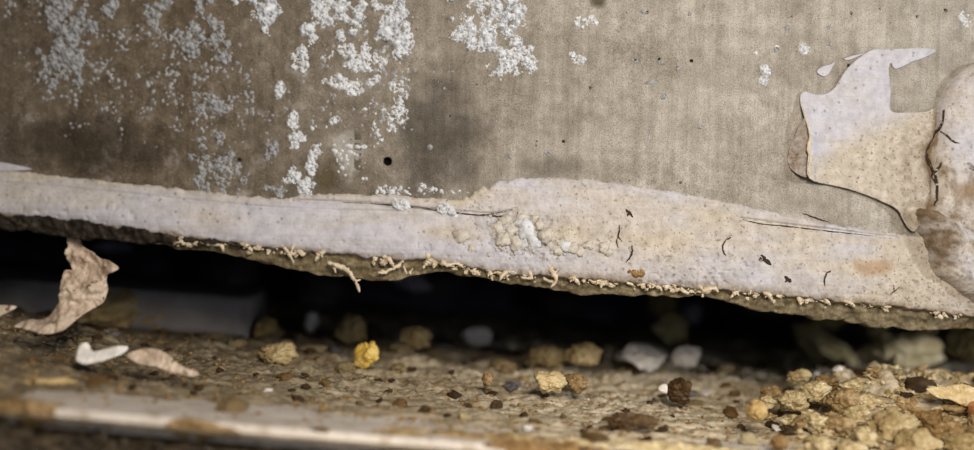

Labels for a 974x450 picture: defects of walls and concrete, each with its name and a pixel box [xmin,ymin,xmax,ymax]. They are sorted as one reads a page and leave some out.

efflorescence [5,0,427,199]
efflorescence [449,0,539,81]
peeling [817,54,863,77]
efflorescence [375,171,469,218]
crack [925,110,958,206]